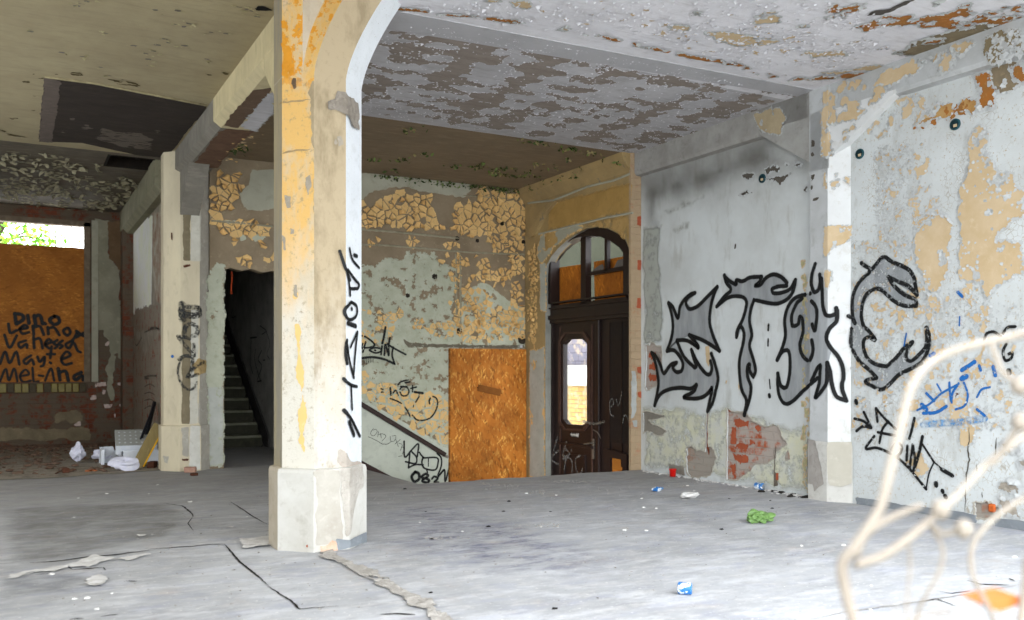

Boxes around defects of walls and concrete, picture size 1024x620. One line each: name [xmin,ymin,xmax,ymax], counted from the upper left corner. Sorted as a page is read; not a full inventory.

flaking render [0,92,294,470]
peeling [294,27,796,552]
peeling [414,0,1024,521]
crack [33,503,329,609]